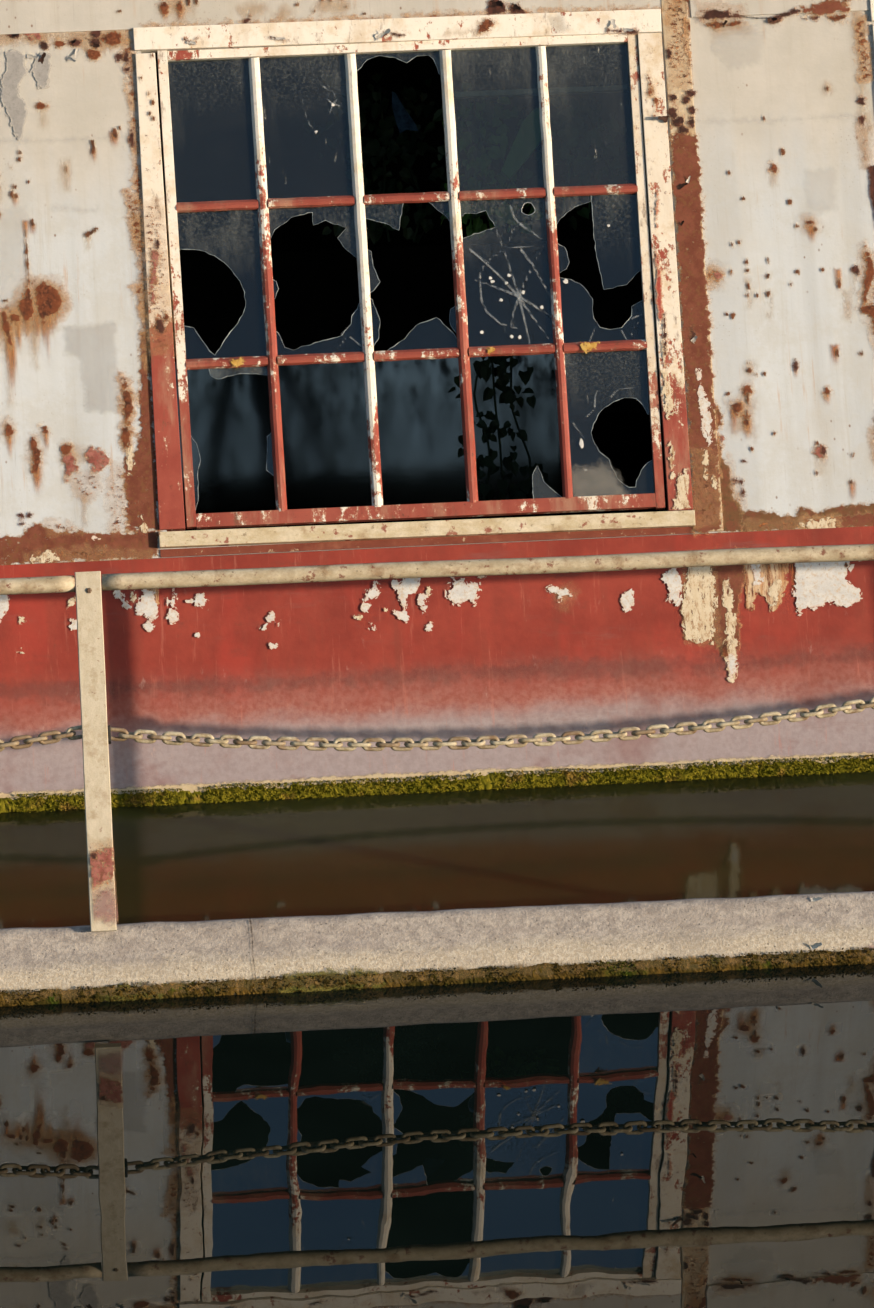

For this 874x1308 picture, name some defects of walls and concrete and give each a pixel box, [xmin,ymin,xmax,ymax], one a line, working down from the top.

rust [146,0,386,27]
peeling [1,49,52,141]
rust [661,0,874,209]
rust [0,30,151,374]
rust [821,242,874,335]
rust [726,362,766,463]
peeling [0,595,27,625]
peeling [68,596,77,631]
peeling [113,588,207,632]
peeling [354,576,487,632]
peeling [661,561,863,683]
rust [90,845,118,922]